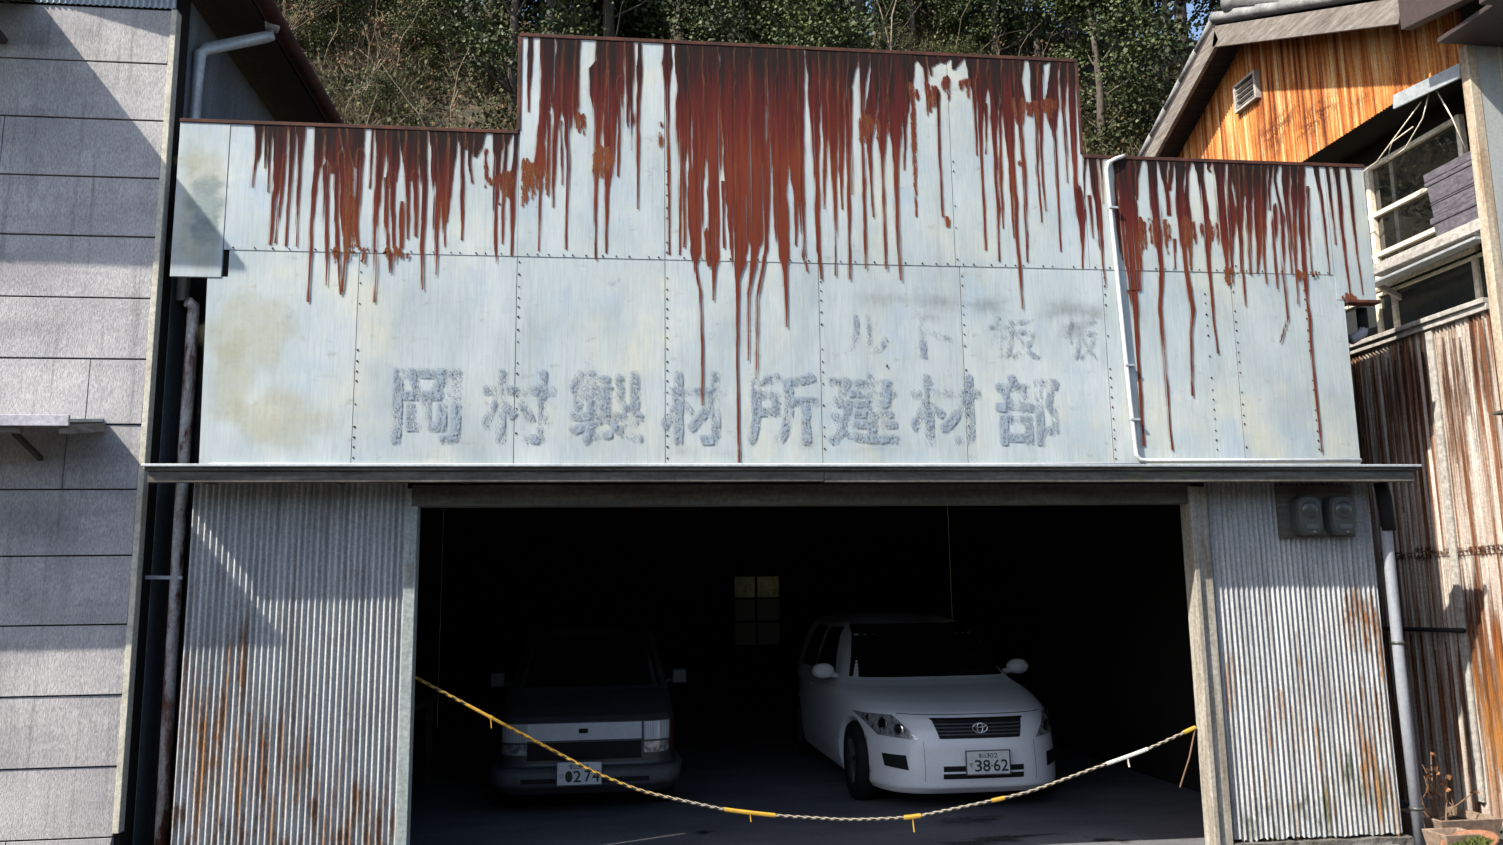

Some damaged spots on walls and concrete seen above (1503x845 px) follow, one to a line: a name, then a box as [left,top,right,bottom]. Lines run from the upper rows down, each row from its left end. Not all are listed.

rust [252,37,642,303]
rust [658,43,1363,463]
rust [1354,326,1503,809]
rust [173,624,394,845]
rust [1345,589,1397,822]